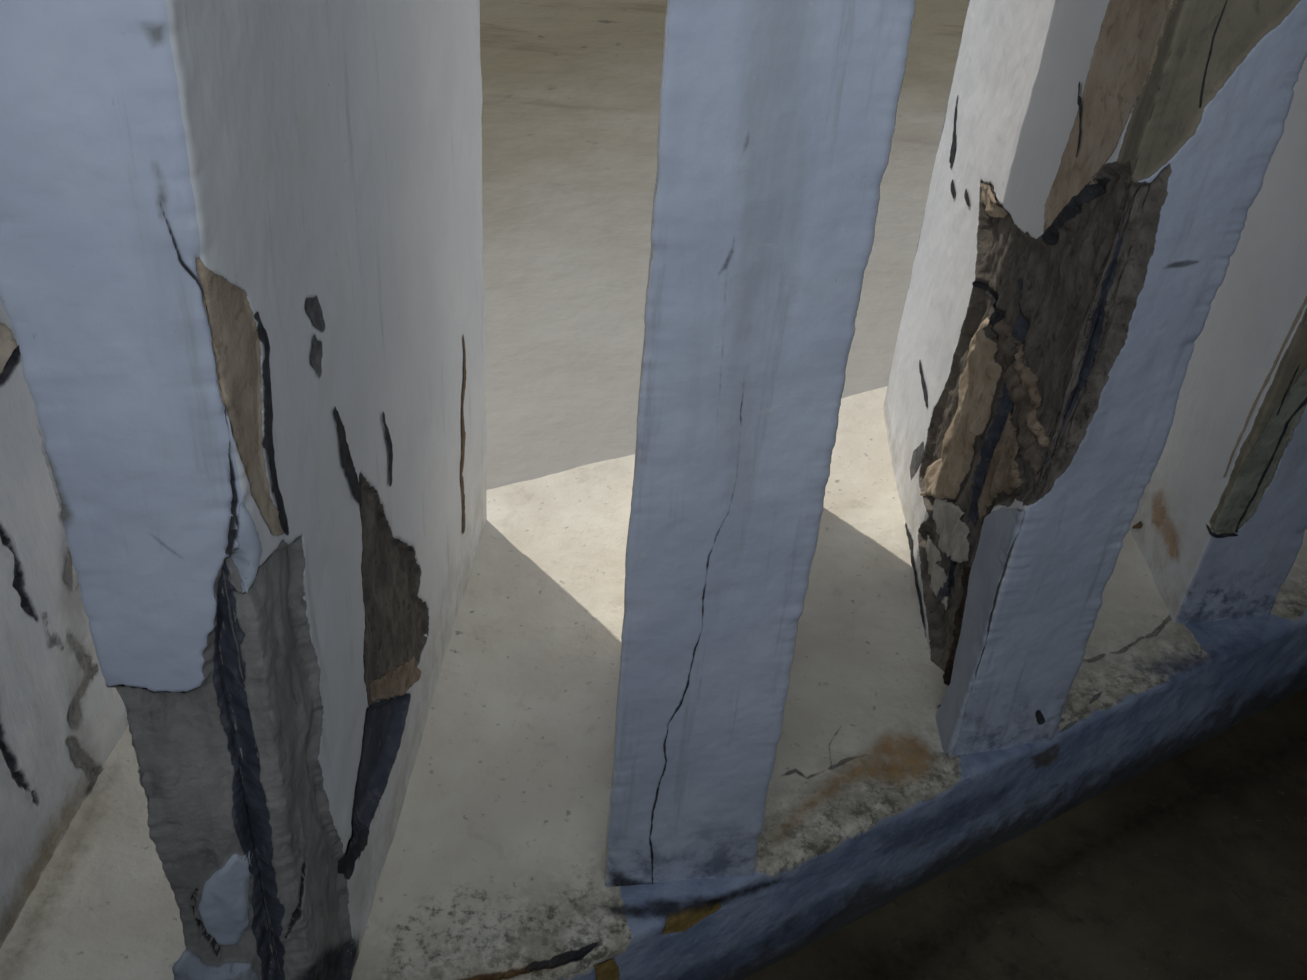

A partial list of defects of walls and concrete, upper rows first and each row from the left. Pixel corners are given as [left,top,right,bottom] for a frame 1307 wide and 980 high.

spalling [0,323,21,386]
spalling [910,0,1307,755]
crack [0,526,103,803]
spalling [106,212,429,980]
crack [649,519,725,884]
crack [461,942,598,980]